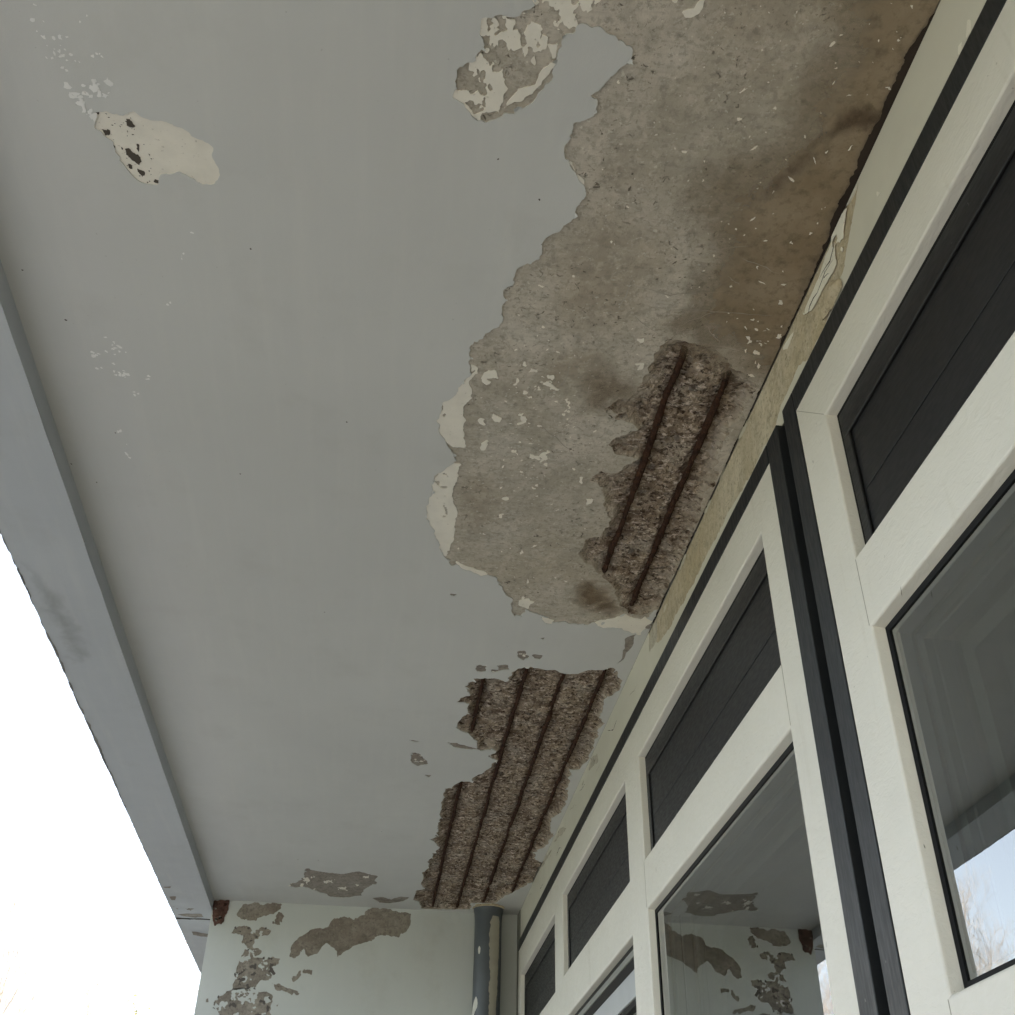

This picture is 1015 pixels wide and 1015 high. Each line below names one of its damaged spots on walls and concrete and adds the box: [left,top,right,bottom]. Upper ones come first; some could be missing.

peeling [95,111,220,185]
peeling [411,0,870,910]
peeling [289,868,378,897]
peeling [206,900,411,1015]